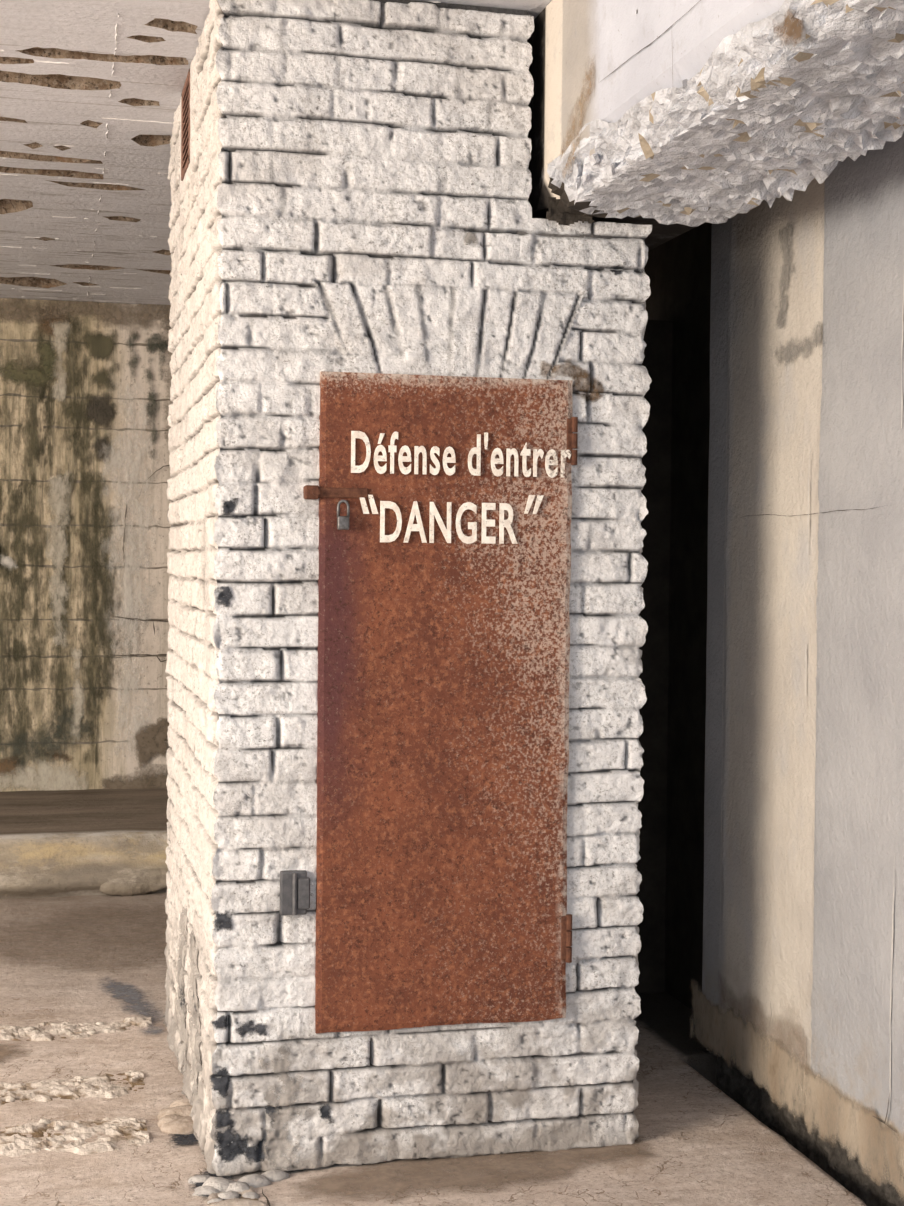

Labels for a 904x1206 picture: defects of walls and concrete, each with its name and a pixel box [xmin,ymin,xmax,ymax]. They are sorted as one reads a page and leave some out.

spalling [0,18,197,106]
spalling [80,120,102,128]
spalling [547,0,904,227]
spalling [0,142,144,190]
spalling [0,199,33,214]
spalling [0,264,171,288]
water stain [0,318,172,791]